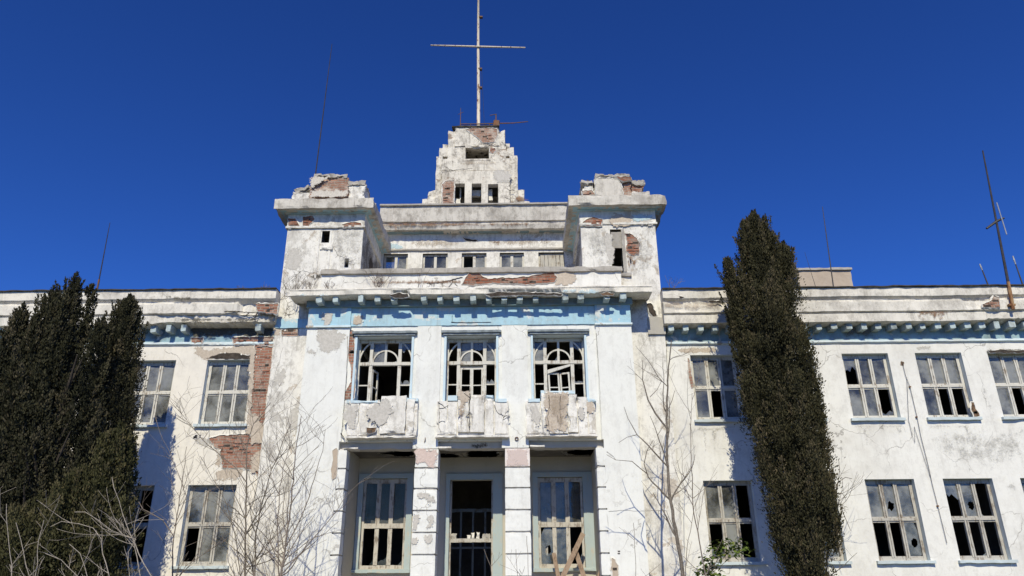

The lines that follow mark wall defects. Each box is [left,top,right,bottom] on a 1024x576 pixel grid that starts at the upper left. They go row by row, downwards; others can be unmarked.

flaking render [441,180,455,203]
flaking render [580,212,652,265]
flaking render [461,272,577,298]
flaking render [191,302,301,482]
peeling [307,312,394,435]
peeling [530,390,596,433]
peeling [414,448,446,470]